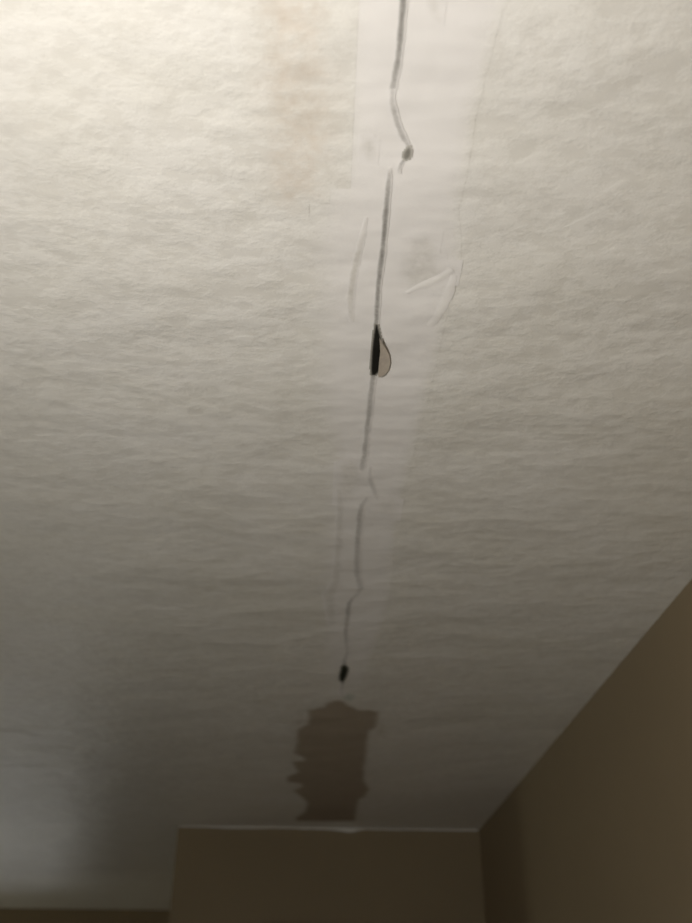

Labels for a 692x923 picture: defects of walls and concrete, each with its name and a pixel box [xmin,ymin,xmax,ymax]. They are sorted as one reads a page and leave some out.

crack [373,0,413,328]
crack [341,375,379,665]
peeling [281,664,393,822]